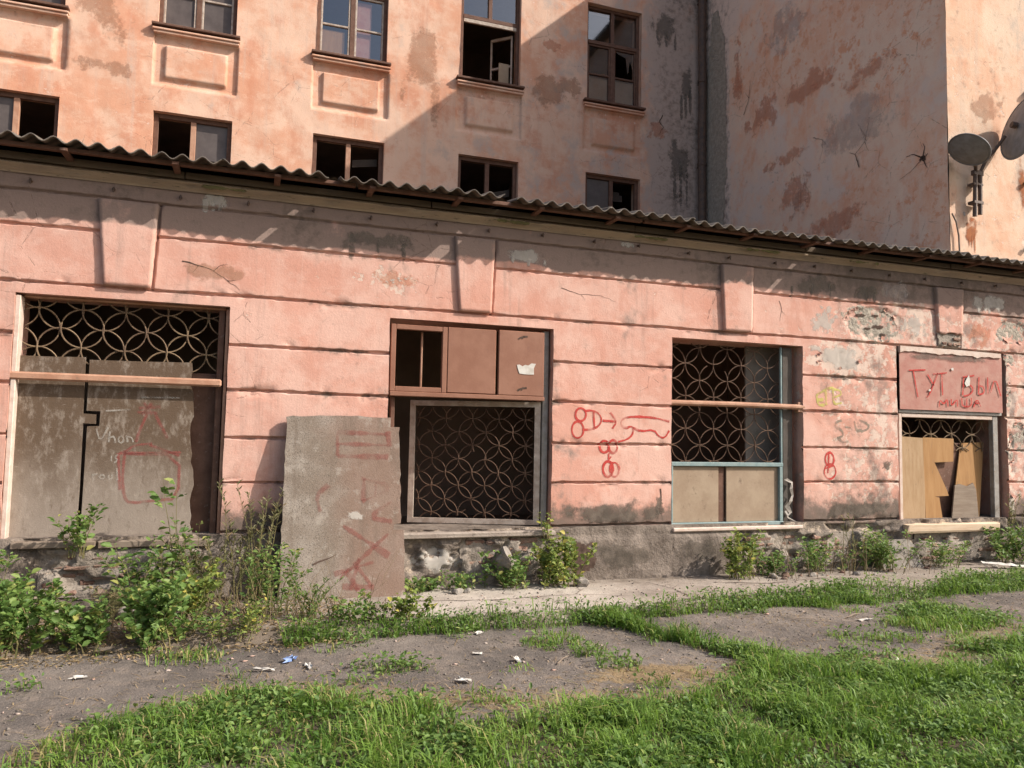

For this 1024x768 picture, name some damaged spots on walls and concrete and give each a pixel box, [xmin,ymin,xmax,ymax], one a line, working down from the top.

leakage [652,13,676,50]
leakage [680,70,692,119]
leakage [669,140,689,201]
crack [182,261,235,286]
peeling [812,346,861,370]
spalling [812,305,961,349]
spalling [996,317,1024,367]
leakage [565,497,665,526]
flaking render [410,537,561,577]